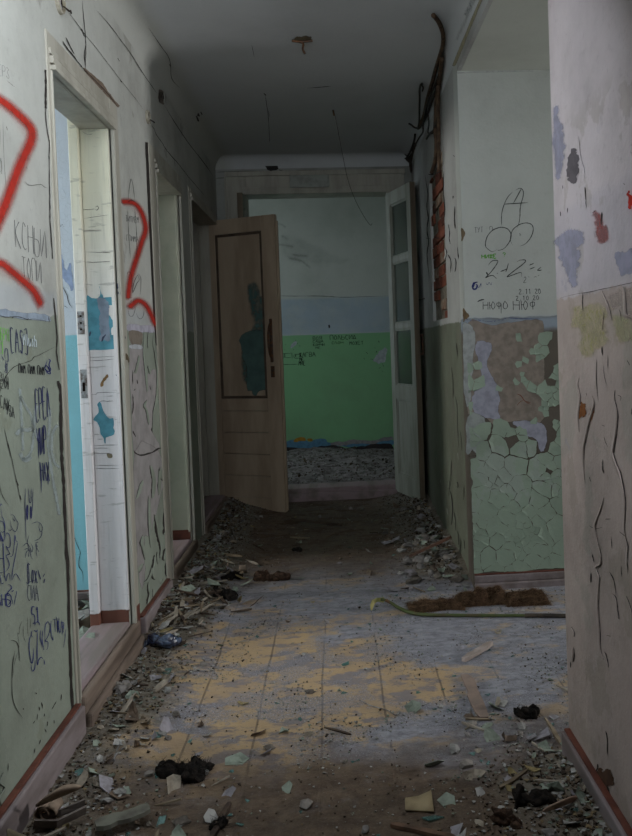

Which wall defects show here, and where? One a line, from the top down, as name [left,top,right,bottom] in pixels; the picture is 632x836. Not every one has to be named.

peeling [552,106,579,184]
flaking render [425,152,448,321]
peeling [554,230,583,287]
peeling [615,249,632,276]
peeling [87,283,119,350]
crack [565,282,632,330]
peeling [92,402,115,443]
crack [93,331,167,605]
peeling [125,324,163,588]
peeling [463,308,564,574]
crack [575,353,632,668]
crack [568,627,576,668]